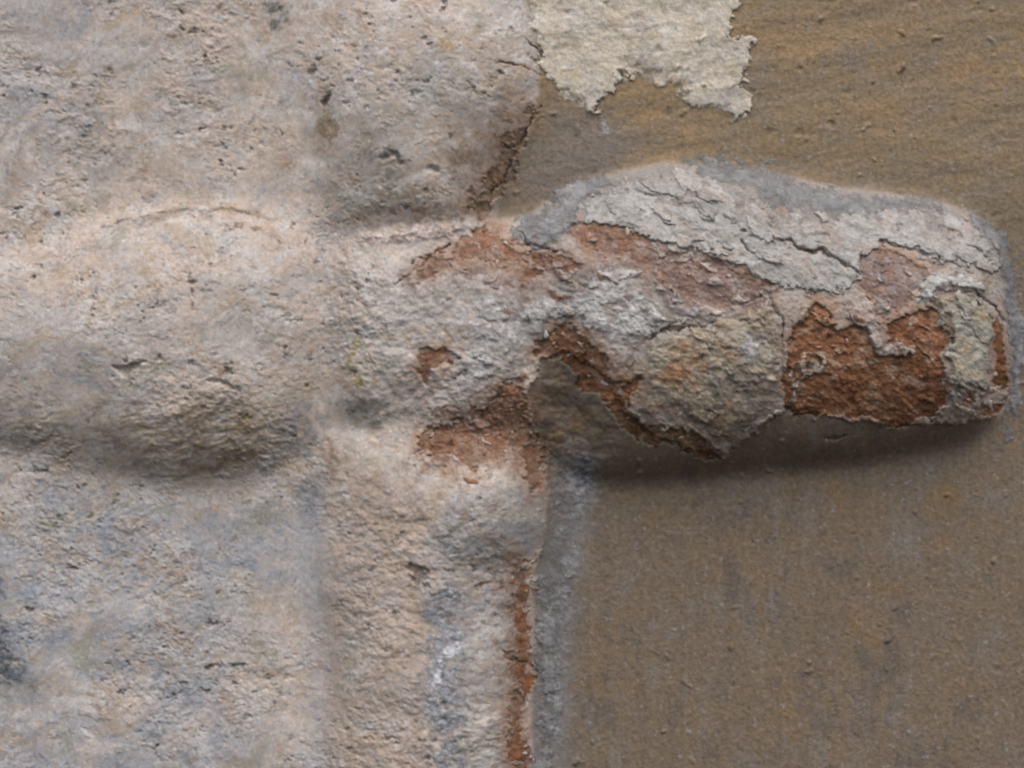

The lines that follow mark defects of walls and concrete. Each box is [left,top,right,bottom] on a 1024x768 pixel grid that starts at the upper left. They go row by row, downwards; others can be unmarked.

flaking render [528,0,757,135]
crack [489,116,533,204]
flaking render [417,161,1009,460]
crack [775,239,859,273]
spalling [418,357,552,493]